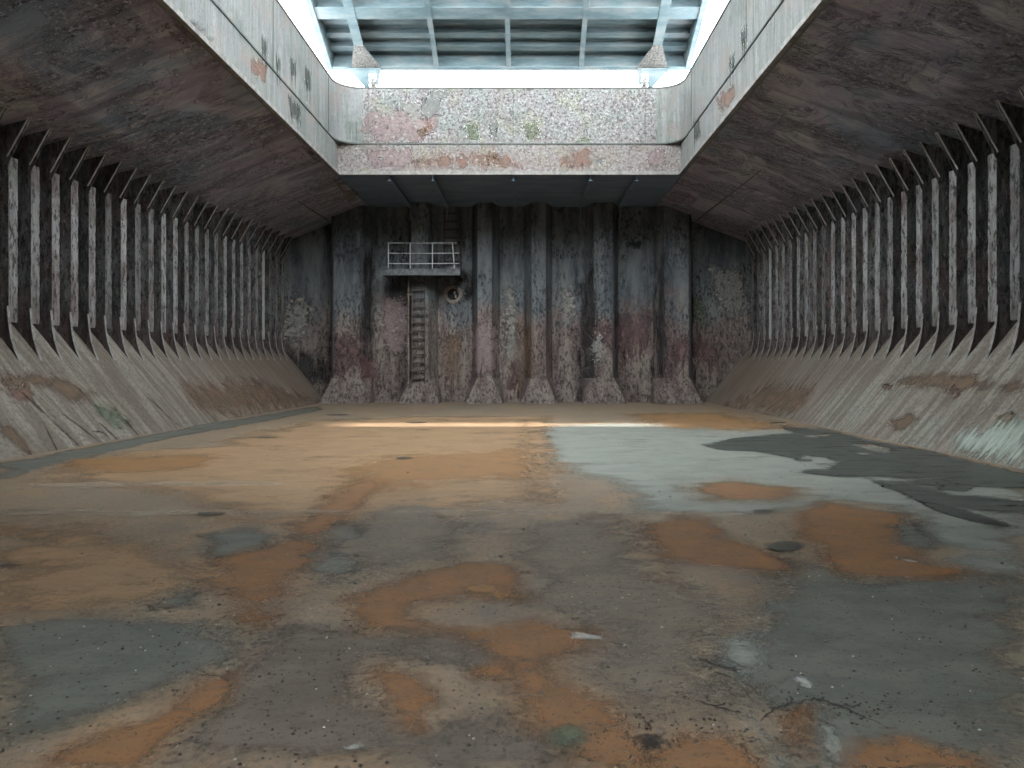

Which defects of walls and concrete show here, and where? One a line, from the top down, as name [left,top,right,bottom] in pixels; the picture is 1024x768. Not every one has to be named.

peeling [361,90,449,143]
rust [365,148,519,169]
rust [561,147,592,171]
rust [35,416,567,531]
rust [690,481,966,580]
damp [504,420,1024,768]